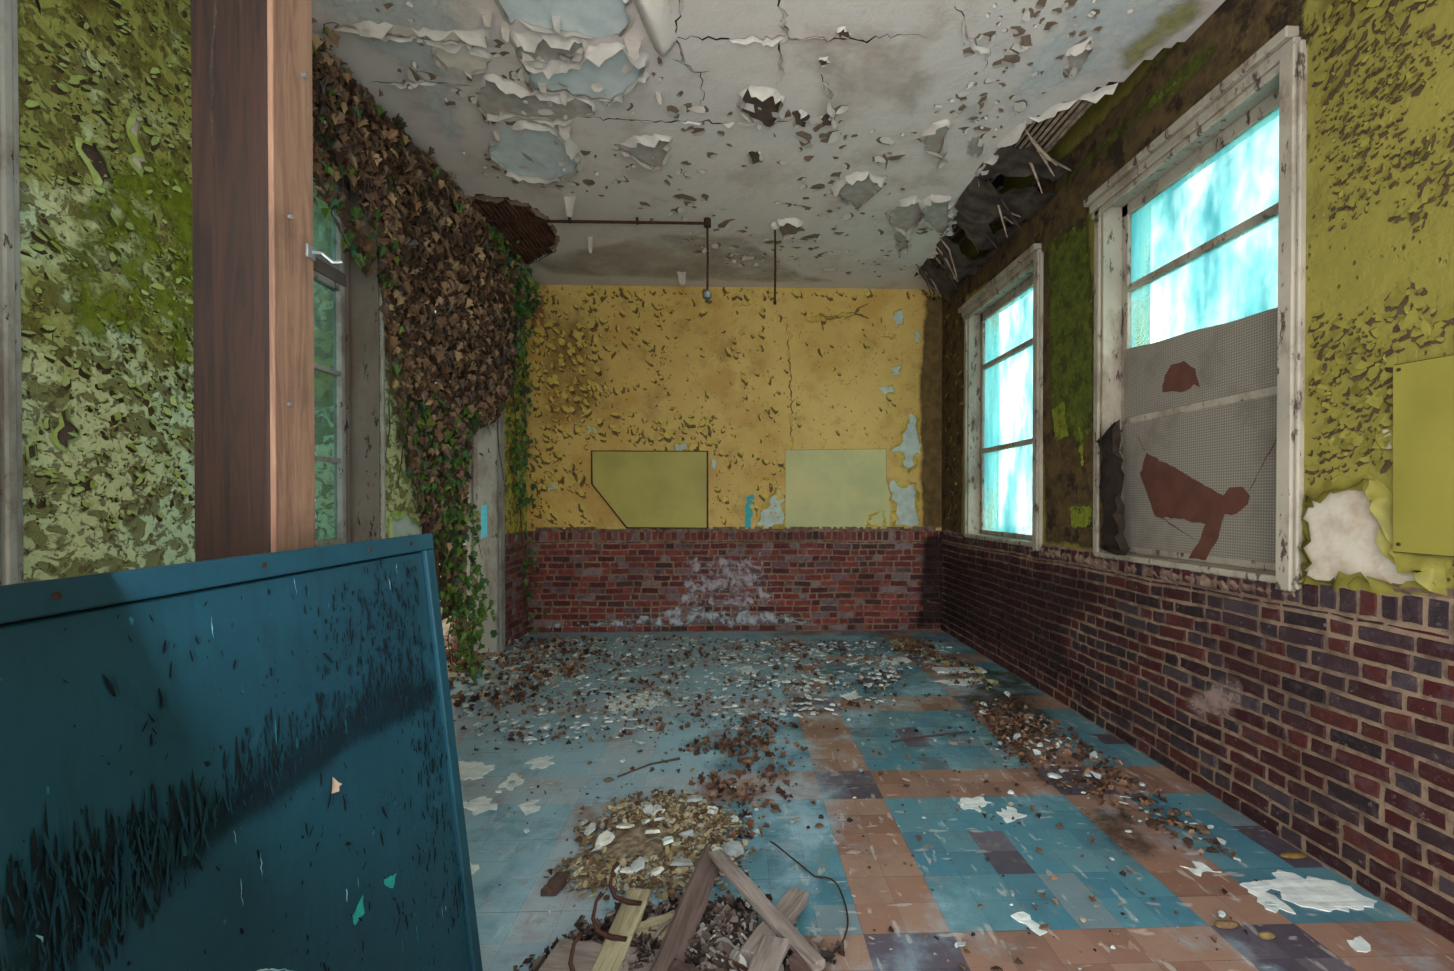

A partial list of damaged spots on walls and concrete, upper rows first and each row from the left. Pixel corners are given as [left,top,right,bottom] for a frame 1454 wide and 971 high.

crack [374,34,476,89]
crack [575,0,991,129]
peeling [19,0,195,535]
peeling [334,0,1454,597]
leakage [548,552,806,628]